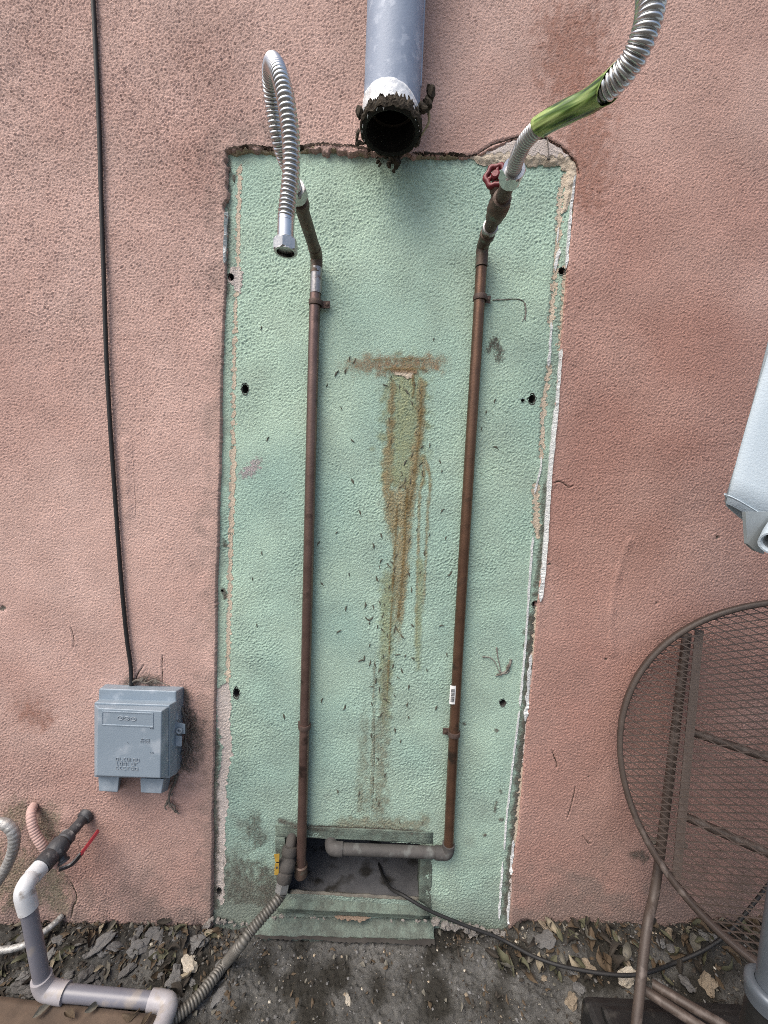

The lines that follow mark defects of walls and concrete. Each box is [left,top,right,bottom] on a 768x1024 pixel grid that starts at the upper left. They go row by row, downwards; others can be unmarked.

flaking render [300,105,371,158]
corrosion [347,354,441,713]
peeling [390,139,577,939]
damp [181,690,275,909]